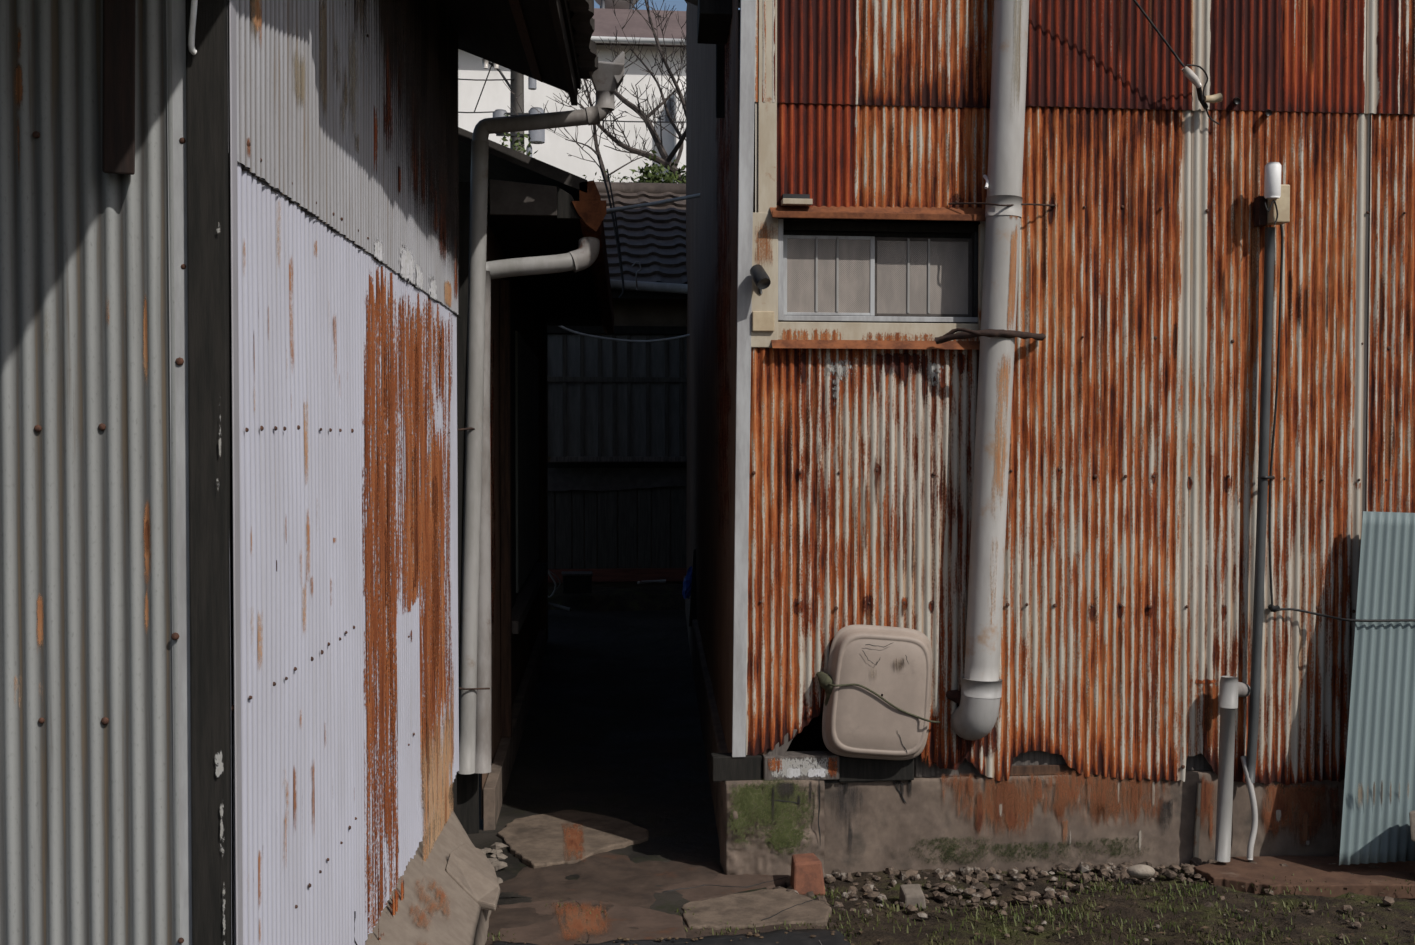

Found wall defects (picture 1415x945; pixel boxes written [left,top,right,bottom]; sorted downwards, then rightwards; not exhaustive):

corrosion [354,11,458,940]
corrosion [747,0,1415,844]
water stain [1152,781,1173,826]